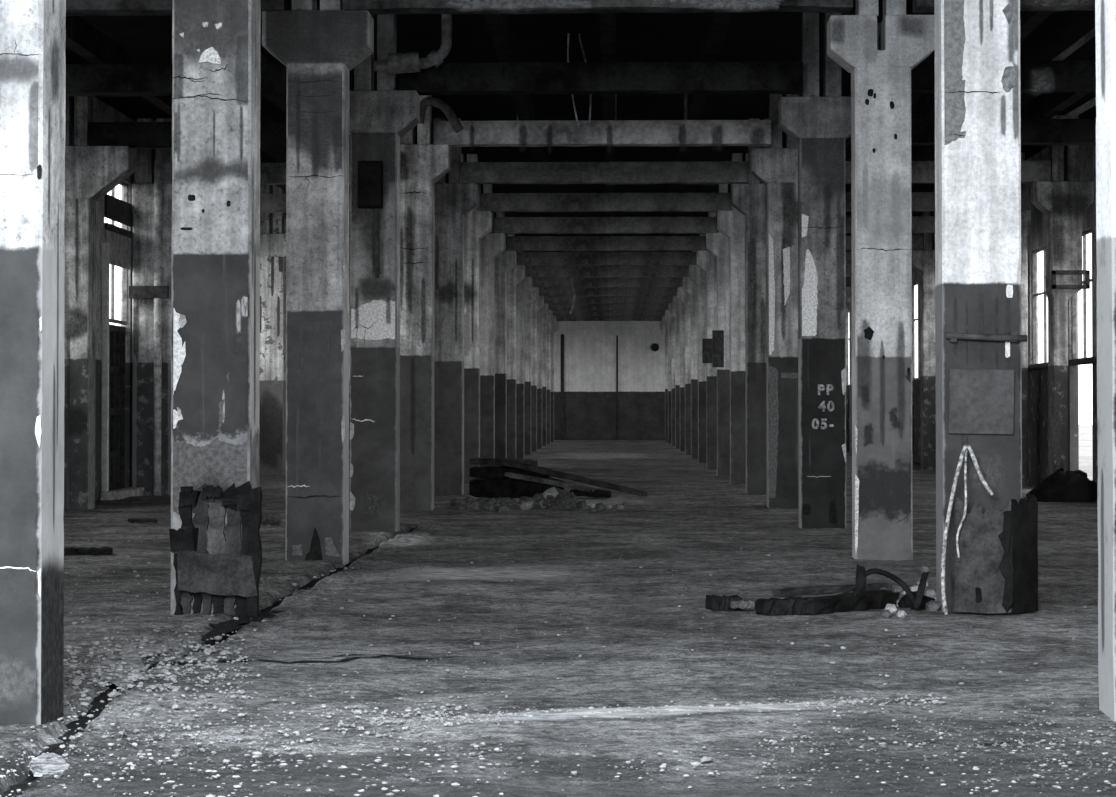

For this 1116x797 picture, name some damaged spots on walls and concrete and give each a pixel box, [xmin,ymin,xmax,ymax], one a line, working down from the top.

spalling [196,47,222,65]
peeling [944,0,966,145]
peeling [173,308,186,395]
peeling [173,399,247,514]
crack [2,528,487,797]